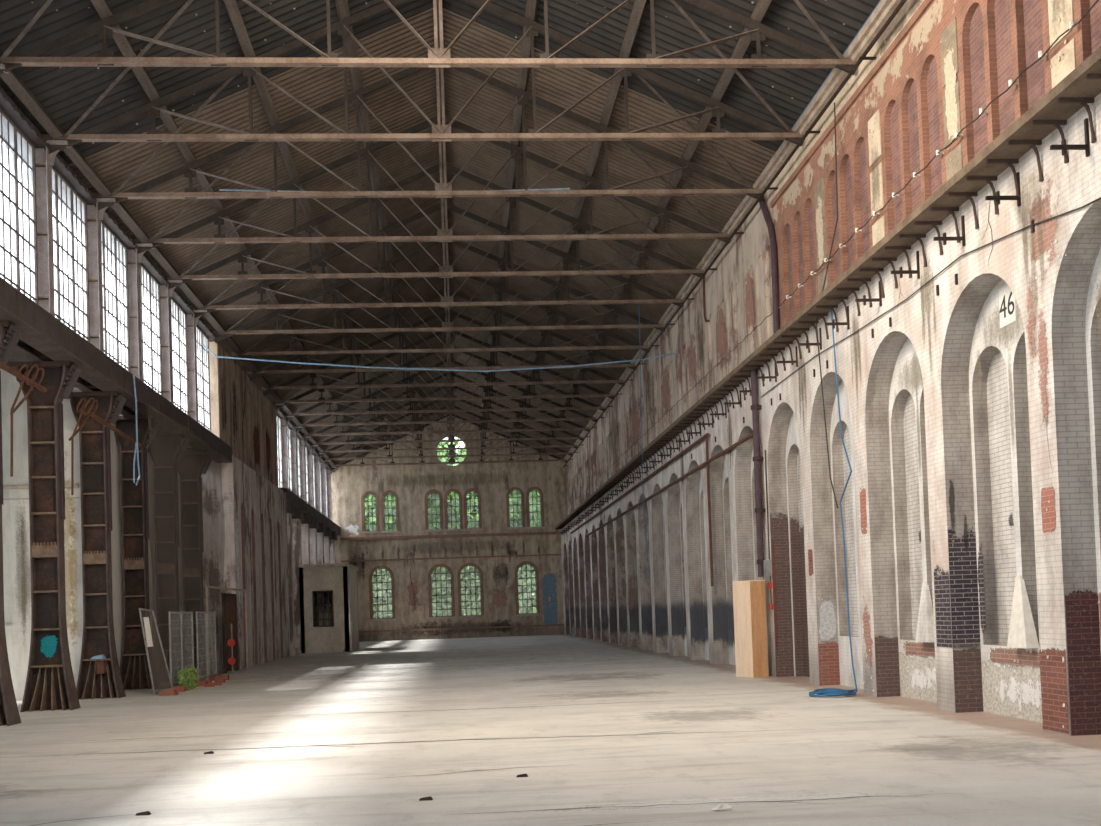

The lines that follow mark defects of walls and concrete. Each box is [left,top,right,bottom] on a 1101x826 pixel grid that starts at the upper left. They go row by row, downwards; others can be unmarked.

flaking render [941,40,958,161]
spalling [1041,487,1056,533]
spalling [770,513,840,686]
spalling [953,589,1101,736]